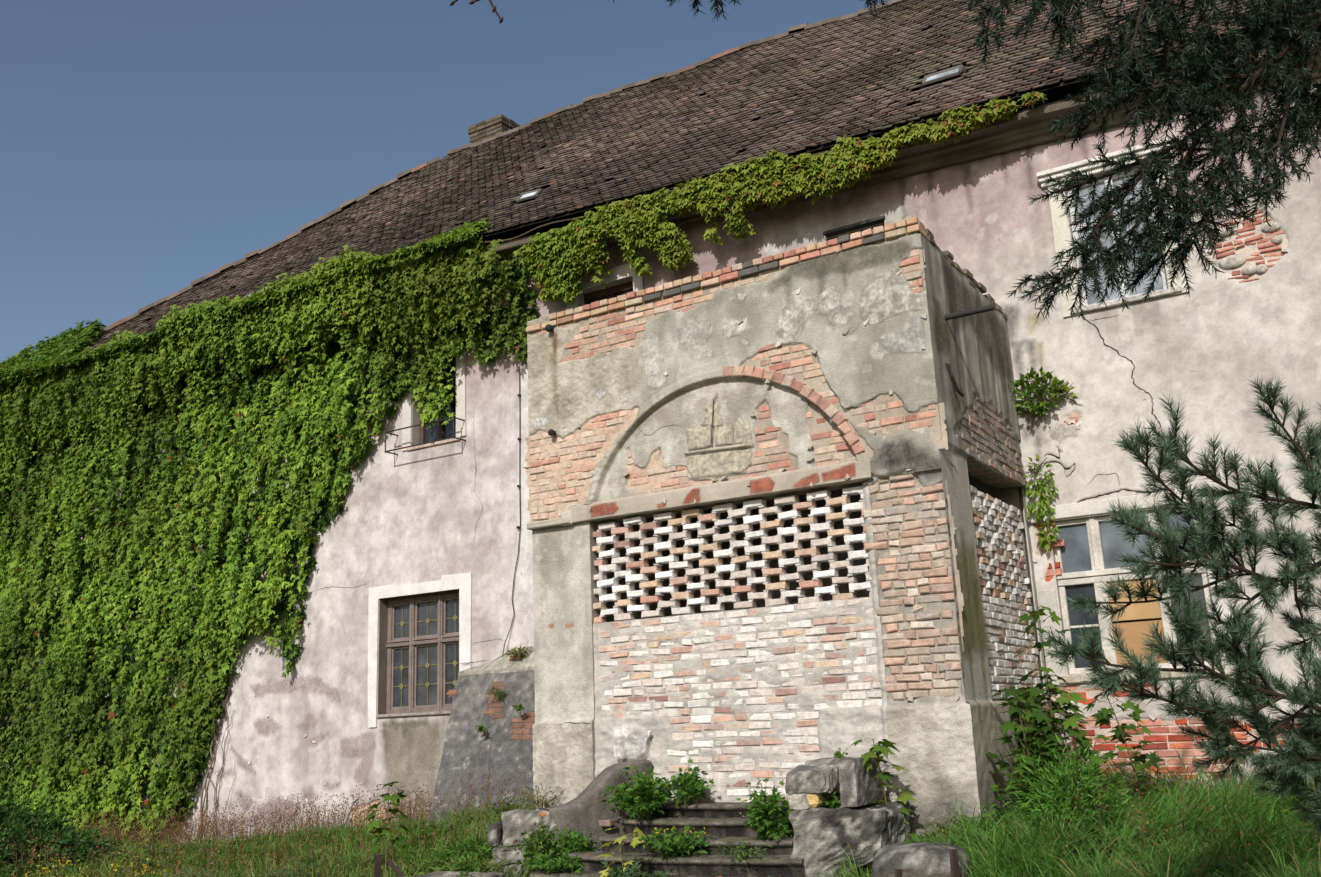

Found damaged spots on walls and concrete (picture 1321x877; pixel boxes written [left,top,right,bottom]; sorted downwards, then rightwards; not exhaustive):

spalling [1207,207,1288,283]
spalling [529,216,1027,508]
crack [1083,315,1161,427]
spalling [523,408,639,523]
spalling [483,681,535,740]
spalling [1045,684,1299,781]